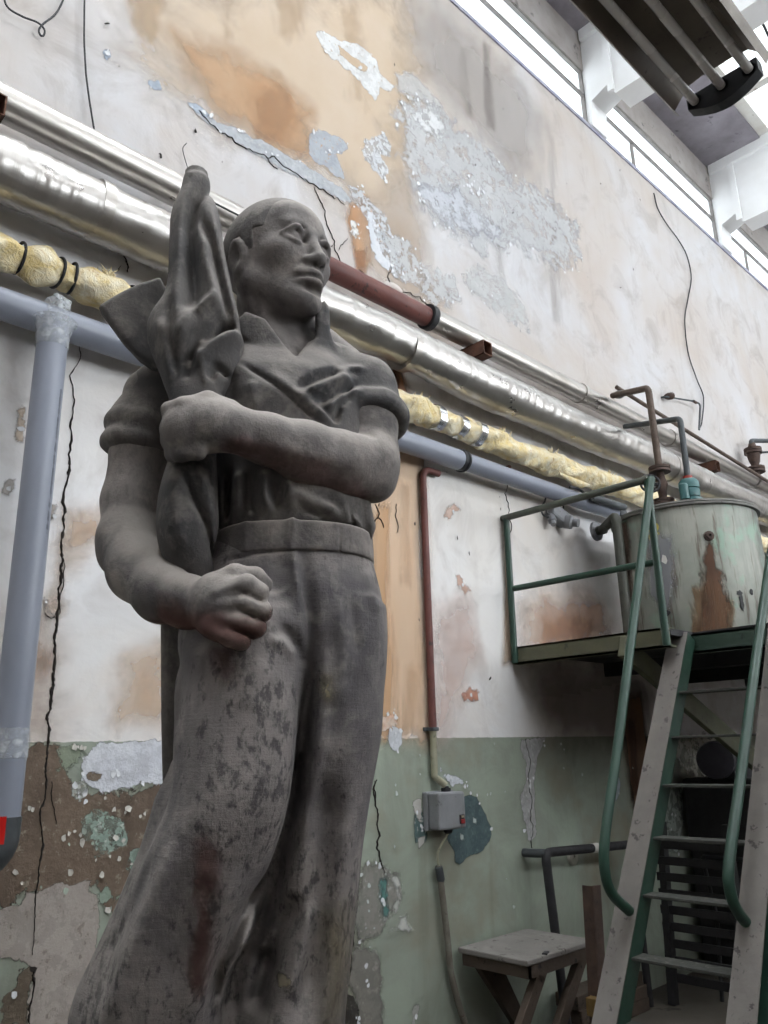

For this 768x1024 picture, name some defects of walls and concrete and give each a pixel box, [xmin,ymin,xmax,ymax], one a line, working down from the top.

water stain [142,0,437,298]
peeling [188,102,462,308]
peeling [316,30,582,273]
crack [27,347,81,1024]
peeling [0,738,163,1024]
peeling [345,860,411,1024]
crack [372,780,385,873]
peeling [382,709,403,753]
peeling [413,799,427,848]
peeling [440,767,493,865]
flaking render [462,687,479,701]
peeling [520,735,548,841]